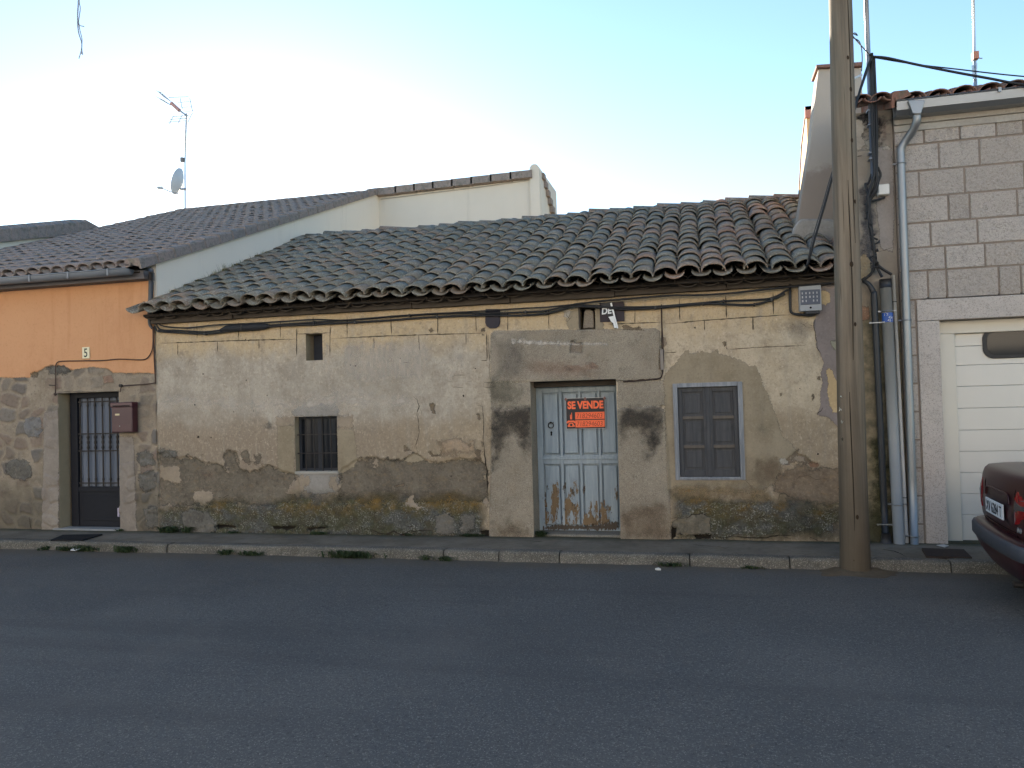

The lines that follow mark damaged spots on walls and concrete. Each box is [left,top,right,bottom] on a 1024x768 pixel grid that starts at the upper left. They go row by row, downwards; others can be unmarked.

leakage [492,411,529,448]
leakage [622,411,661,447]
flaking render [137,448,195,493]
flaking render [181,508,217,533]
peeling [543,480,619,531]